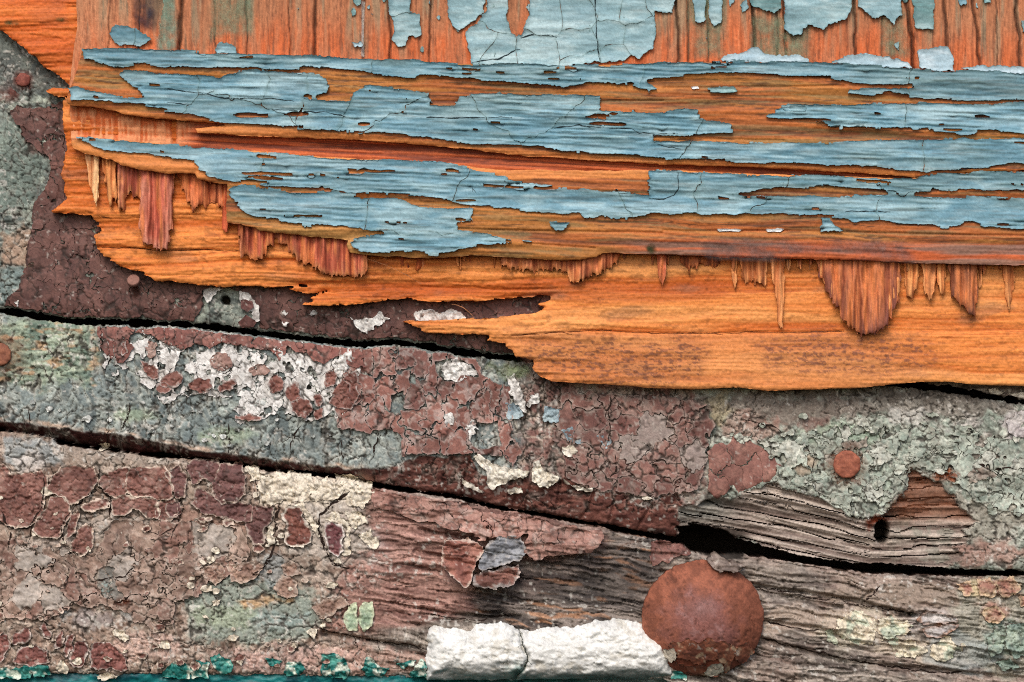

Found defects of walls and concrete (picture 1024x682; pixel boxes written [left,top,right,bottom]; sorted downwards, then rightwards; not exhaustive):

peeling [4,0,1024,517]
crack [2,469,112,549]
crack [106,403,131,445]
crack [144,496,184,538]
crack [252,480,284,576]
peeling [0,457,604,681]
crack [318,491,350,569]
crack [606,397,620,479]
crack [979,463,1024,476]